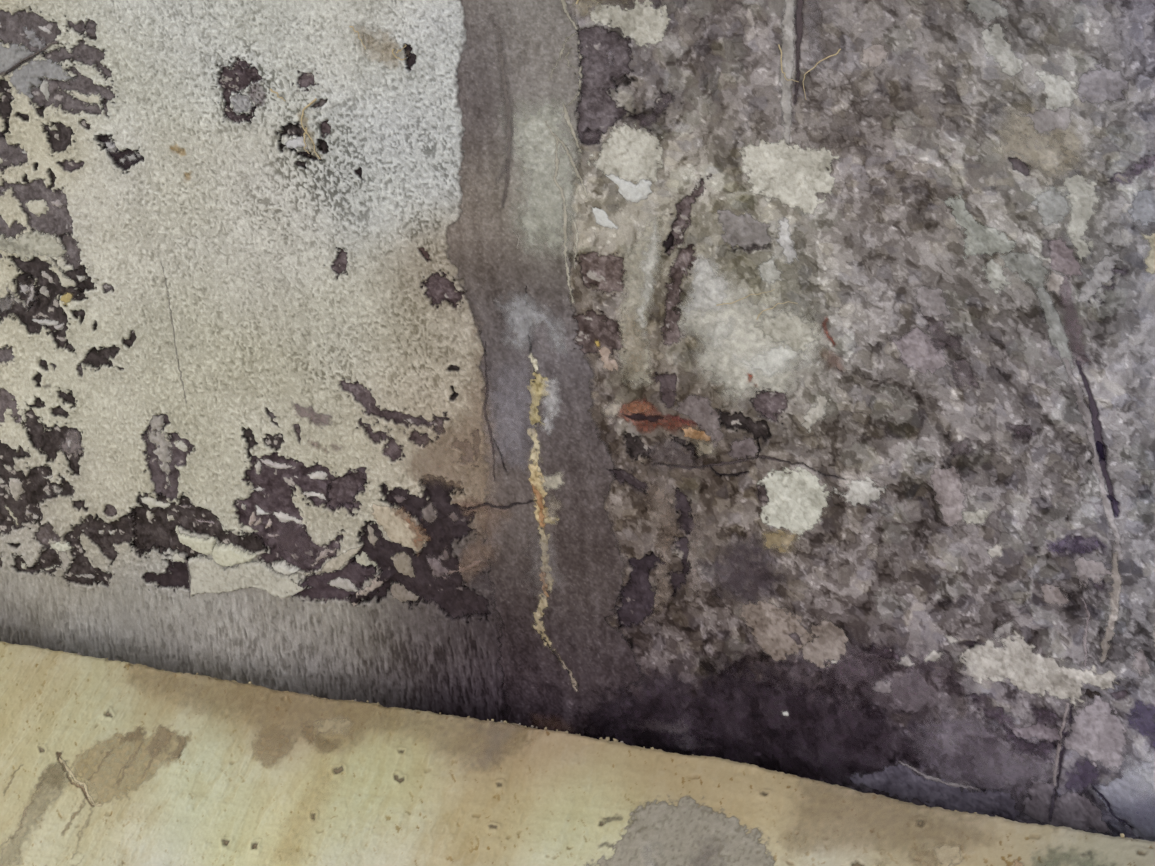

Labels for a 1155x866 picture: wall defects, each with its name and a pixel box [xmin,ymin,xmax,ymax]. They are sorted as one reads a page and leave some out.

spalling [217,56,265,123]
peeling [0,8,144,377]
spalling [277,115,331,168]
leakage [511,104,572,248]
spalling [419,247,465,308]
rust [604,399,714,454]
spalling [0,359,491,623]
crack [468,286,579,691]
leakage [0,765,67,866]
leakage [255,701,363,766]
leakage [586,646,1052,802]
leakage [1065,758,1100,792]